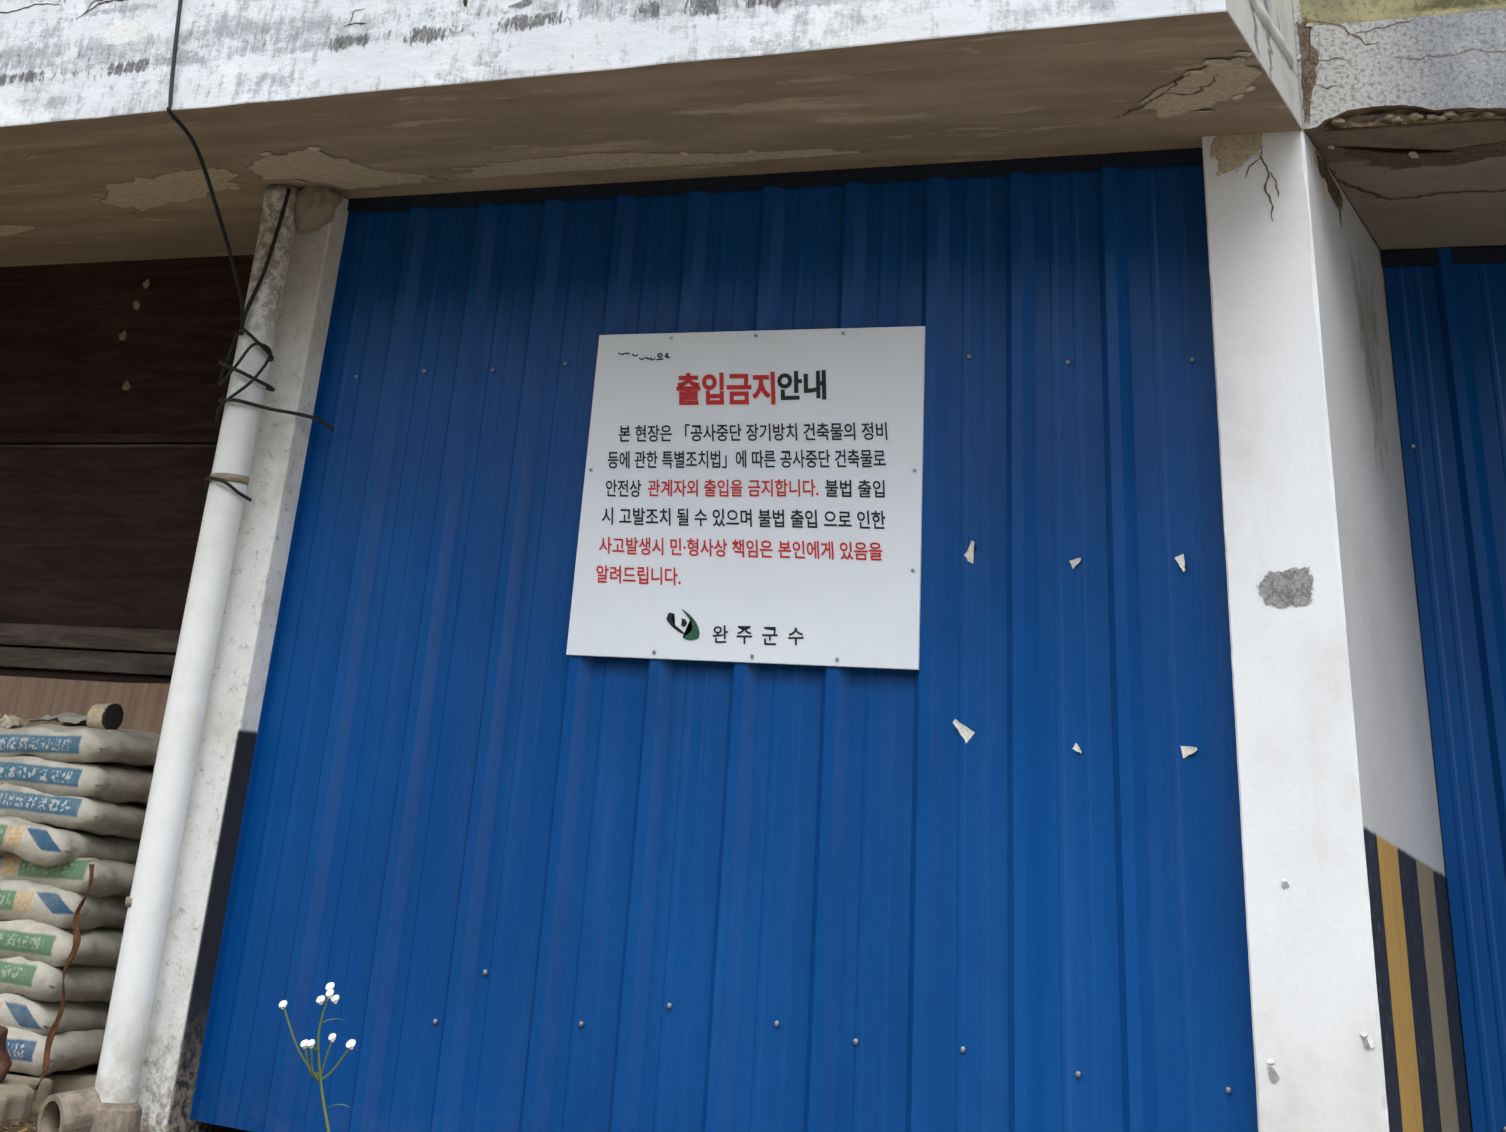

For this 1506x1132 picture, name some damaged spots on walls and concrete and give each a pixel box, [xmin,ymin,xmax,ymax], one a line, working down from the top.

crack [0,0,123,18]
crack [1250,0,1506,89]
crack [1115,68,1219,119]
peeling [1140,52,1263,119]
peeling [1210,133,1262,177]
crack [1246,145,1279,221]
peeling [1296,17,1506,227]